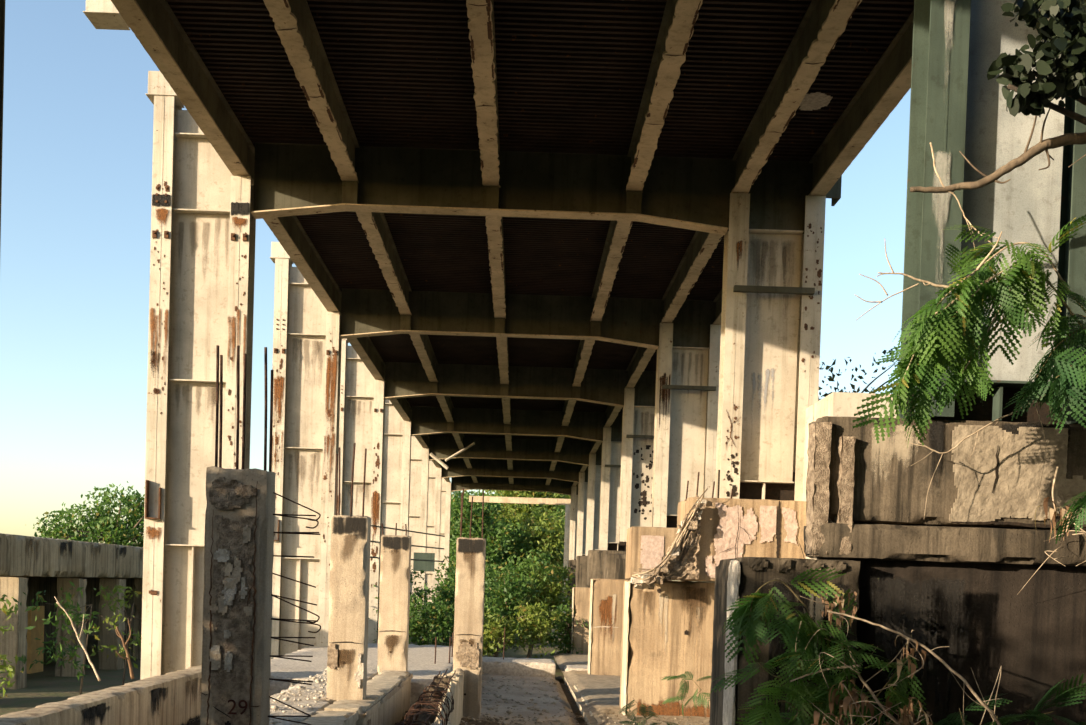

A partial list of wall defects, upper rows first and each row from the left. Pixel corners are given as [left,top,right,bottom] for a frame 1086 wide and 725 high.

leakage [945,0,954,45]
corrosion [156,208,168,224]
corrosion [150,308,168,394]
spalling [264,345,283,474]
corrosion [324,355,337,492]
spalling [209,345,257,725]
peeling [633,445,654,520]
spalling [704,421,856,578]
crack [991,446,999,493]
crack [951,521,1086,530]
leakage [82,703,110,725]
leakage [151,688,168,712]